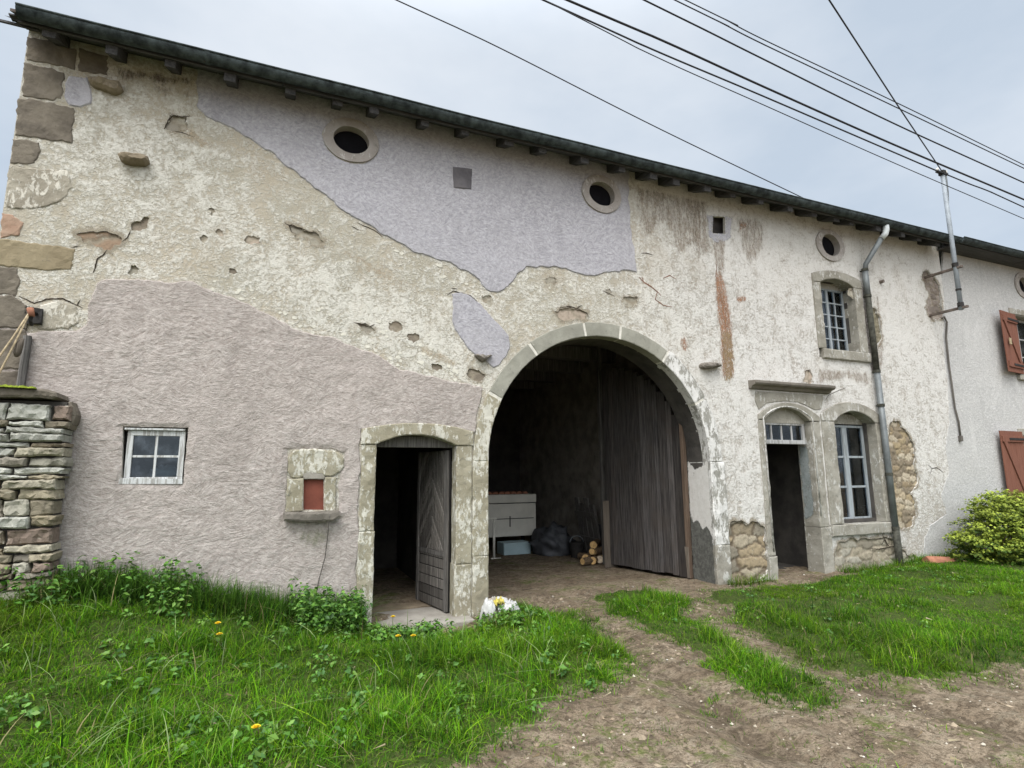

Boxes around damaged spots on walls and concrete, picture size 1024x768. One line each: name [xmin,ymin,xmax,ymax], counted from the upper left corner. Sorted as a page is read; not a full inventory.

spalling [166,114,207,146]
crack [71,230,131,272]
spalling [71,218,149,254]
spalling [285,222,325,248]
spalling [535,277,589,323]
spalling [922,270,944,322]
corrosion [716,273,746,380]
peeling [688,461,713,544]
spalling [834,418,928,572]
spalling [728,517,768,583]